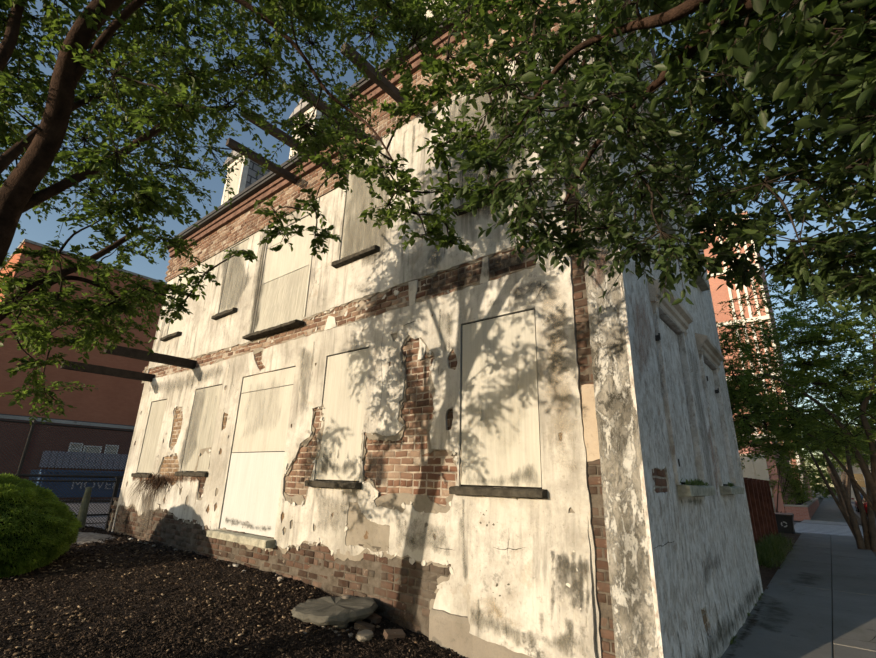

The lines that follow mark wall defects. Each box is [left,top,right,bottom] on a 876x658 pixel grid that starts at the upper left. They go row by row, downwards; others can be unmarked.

peeling [0,403,468,658]
flaking render [142,242,537,383]
spalling [360,333,462,539]
damp [551,552,589,602]
flaking render [563,141,616,658]
spalling [652,468,670,496]